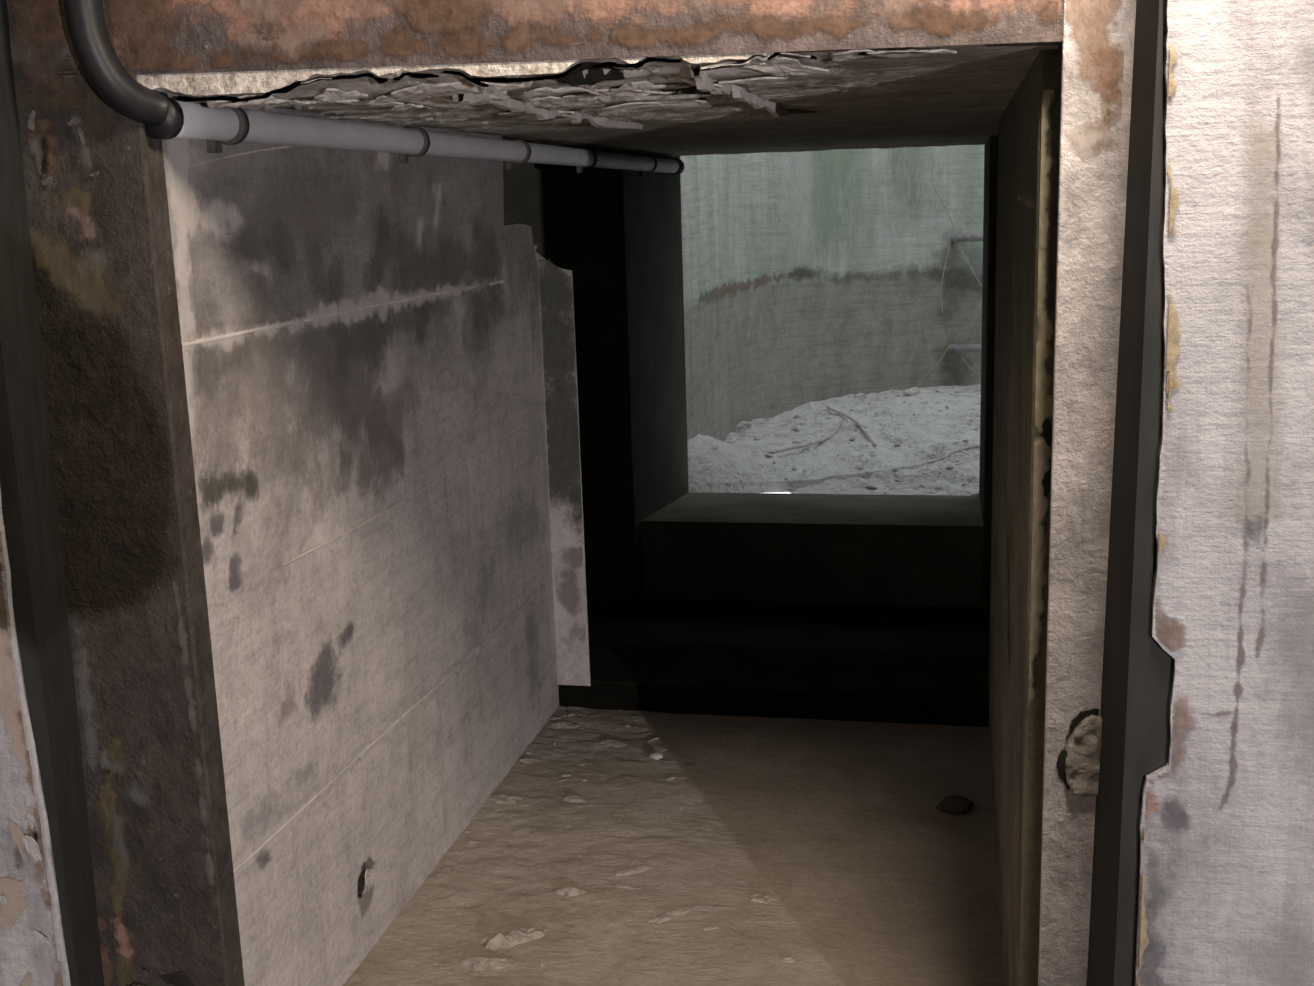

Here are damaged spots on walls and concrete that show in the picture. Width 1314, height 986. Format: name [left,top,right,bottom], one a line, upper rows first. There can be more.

flaking render [177,49,957,116]
rust [107,0,1124,155]
spalling [1168,44,1178,100]
leakage [166,138,502,489]
leakage [942,241,983,314]
spalling [1166,289,1181,413]
spalling [1158,532,1167,581]
spalling [1158,600,1185,651]
peeling [0,629,34,782]
spalling [1056,708,1102,797]
peeling [8,806,42,863]
spalling [1138,875,1149,986]